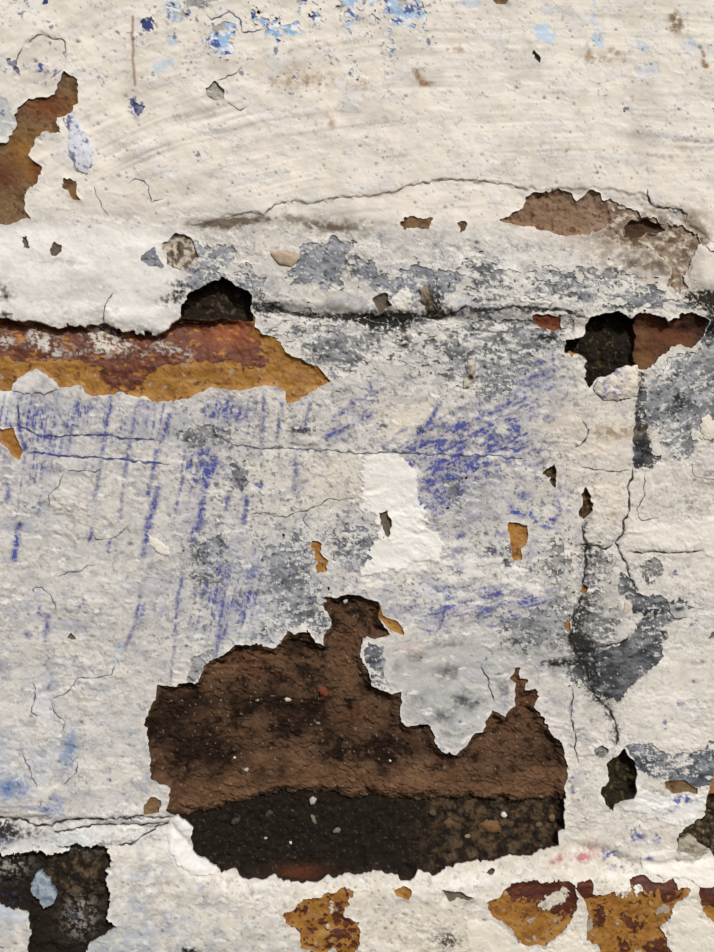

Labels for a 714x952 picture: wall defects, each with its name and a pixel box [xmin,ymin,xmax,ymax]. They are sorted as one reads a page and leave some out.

peeling [140,17,154,32]
peeling [0,72,93,225]
crack [190,178,520,226]
crack [647,190,688,221]
peeling [0,189,714,470]
peeling [175,424,247,492]
crack [568,422,701,762]
spalling [143,511,568,900]
spalling [0,843,113,952]
crack [0,815,169,848]
peeling [283,887,360,952]
peeling [487,738,714,952]